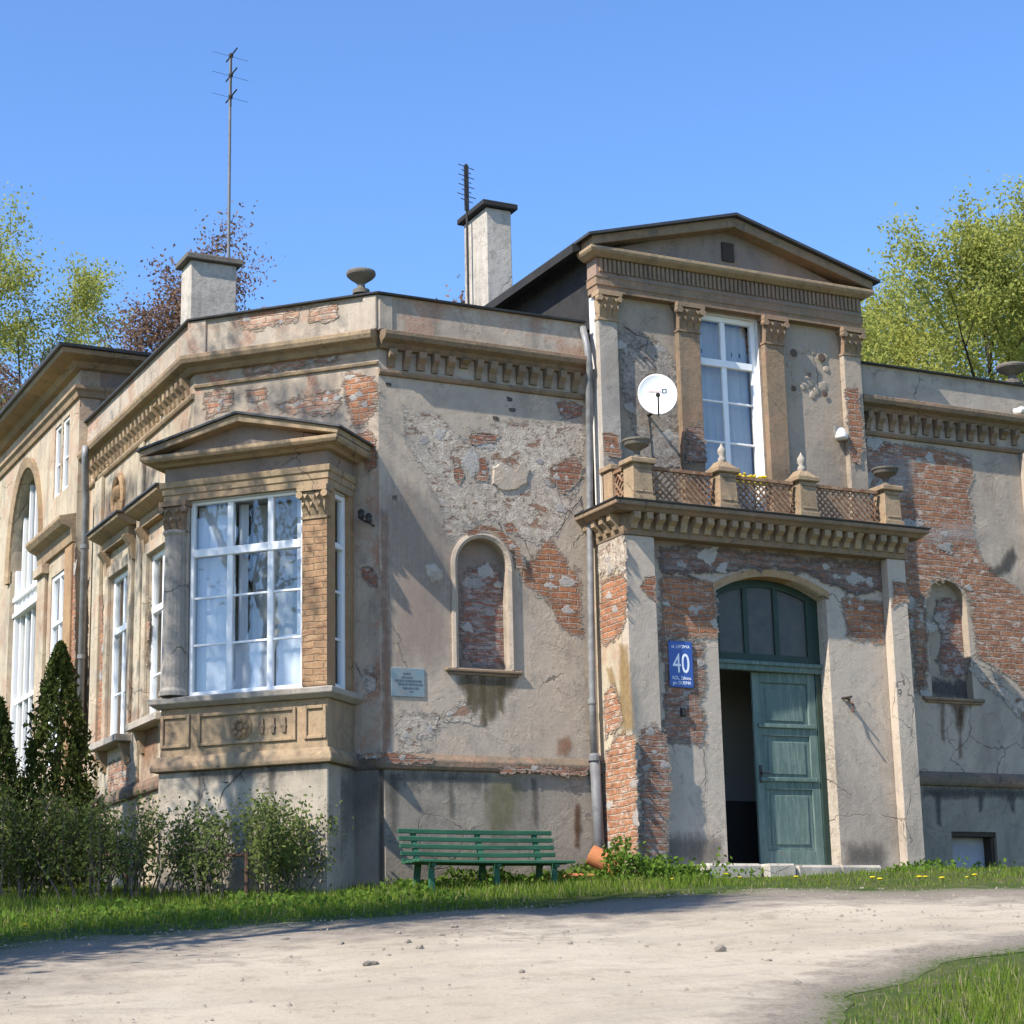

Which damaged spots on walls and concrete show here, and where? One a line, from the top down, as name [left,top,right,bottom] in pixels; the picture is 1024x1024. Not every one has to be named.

spalling [237,302,339,332]
spalling [202,355,392,473]
peeling [398,396,586,639]
spalling [458,562,504,670]
spalling [597,387,1024,859]
peeling [359,696,486,765]
damp [460,676,513,724]
spalling [498,764,588,778]
damp [926,787,1024,824]